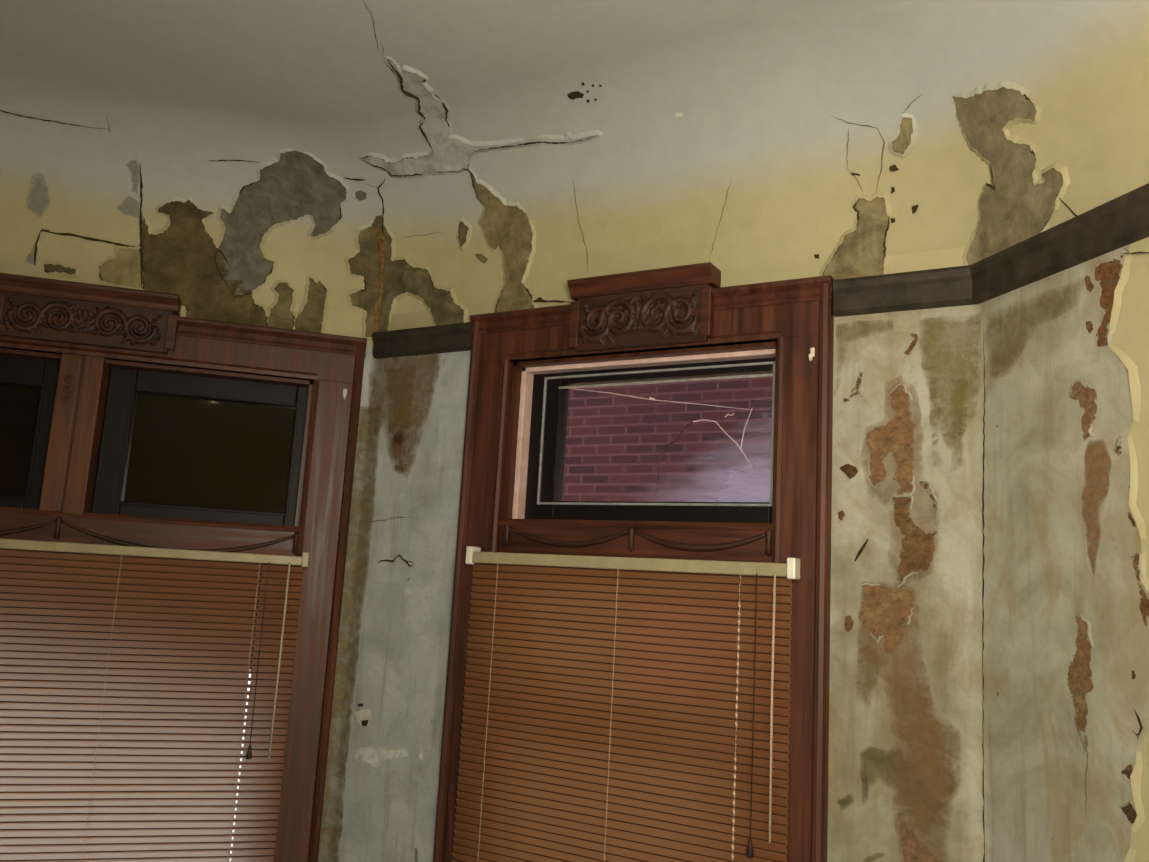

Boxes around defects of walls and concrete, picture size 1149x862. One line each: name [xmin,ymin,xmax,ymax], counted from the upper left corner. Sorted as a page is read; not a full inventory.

crack [0,110,111,131]
peeling [97,148,367,333]
peeling [344,215,469,342]
peeling [358,56,603,313]
peeling [814,187,895,280]
damp [923,289,1070,443]
peeling [951,80,1070,266]
spalling [1085,255,1141,421]
spalling [839,383,938,653]
damp [319,354,438,862]
damp [861,686,957,828]
spalling [1067,613,1095,755]